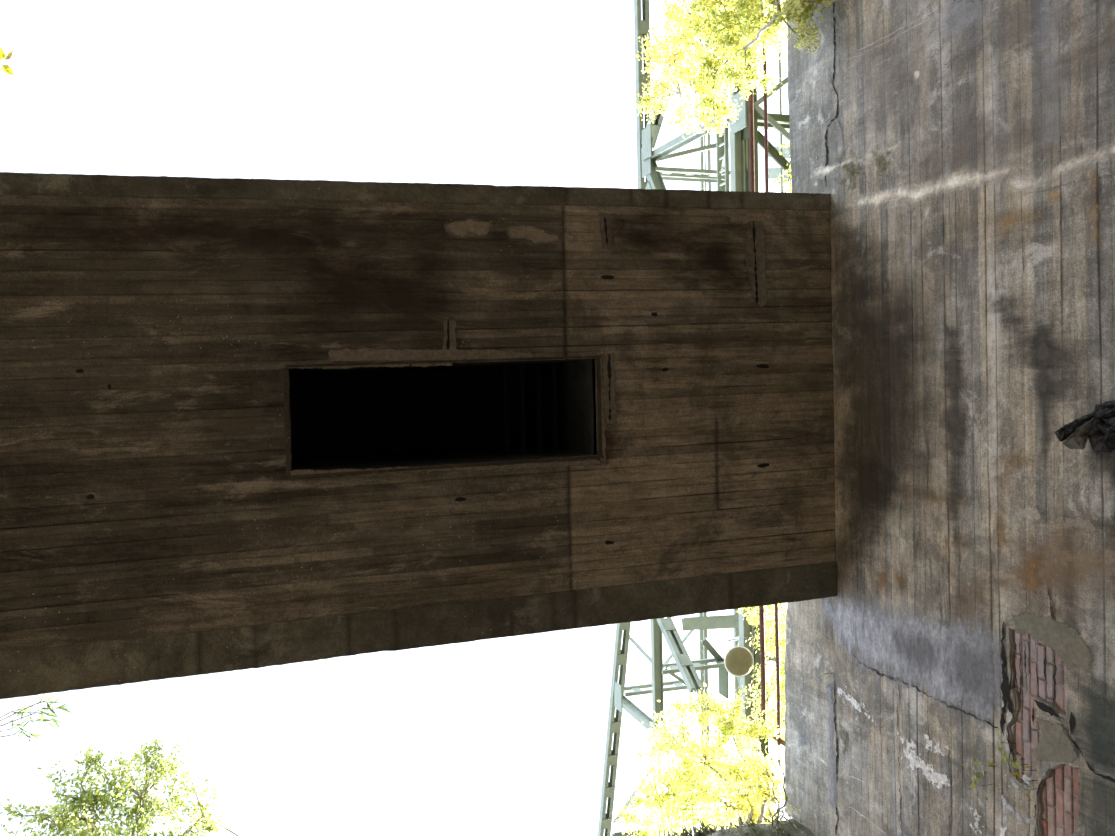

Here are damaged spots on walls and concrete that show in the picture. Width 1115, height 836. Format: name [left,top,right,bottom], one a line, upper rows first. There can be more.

crack [824,3,845,182]
crack [1021,174,1115,314]
crack [832,679,840,834]
crack [846,644,998,836]
spalling [969,622,1080,836]
crack [1070,739,1115,783]